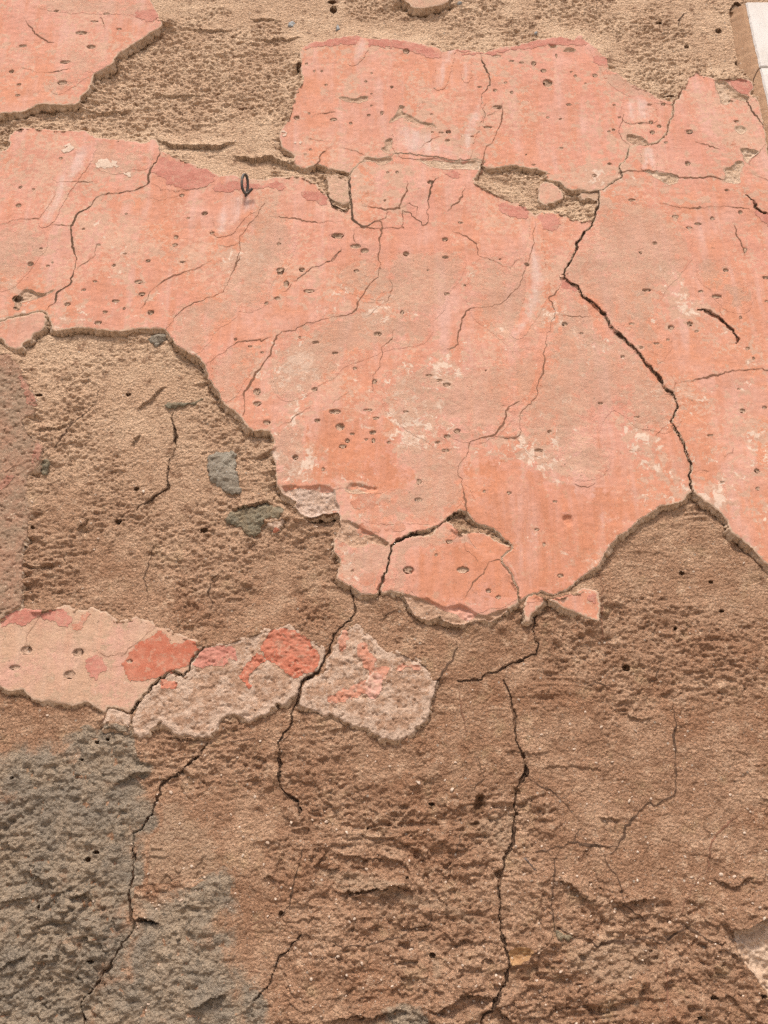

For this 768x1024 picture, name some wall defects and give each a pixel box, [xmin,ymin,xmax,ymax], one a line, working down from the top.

spalling [0,1,165,122]
spalling [339,72,451,142]
flaking render [400,0,462,18]
crack [2,149,213,310]
crack [142,59,536,414]
peeling [0,96,768,629]
crack [379,68,768,620]
crack [118,413,178,523]
spalling [0,644,439,746]
crack [83,592,356,1024]
crack [432,616,742,1024]
spalling [733,919,768,998]